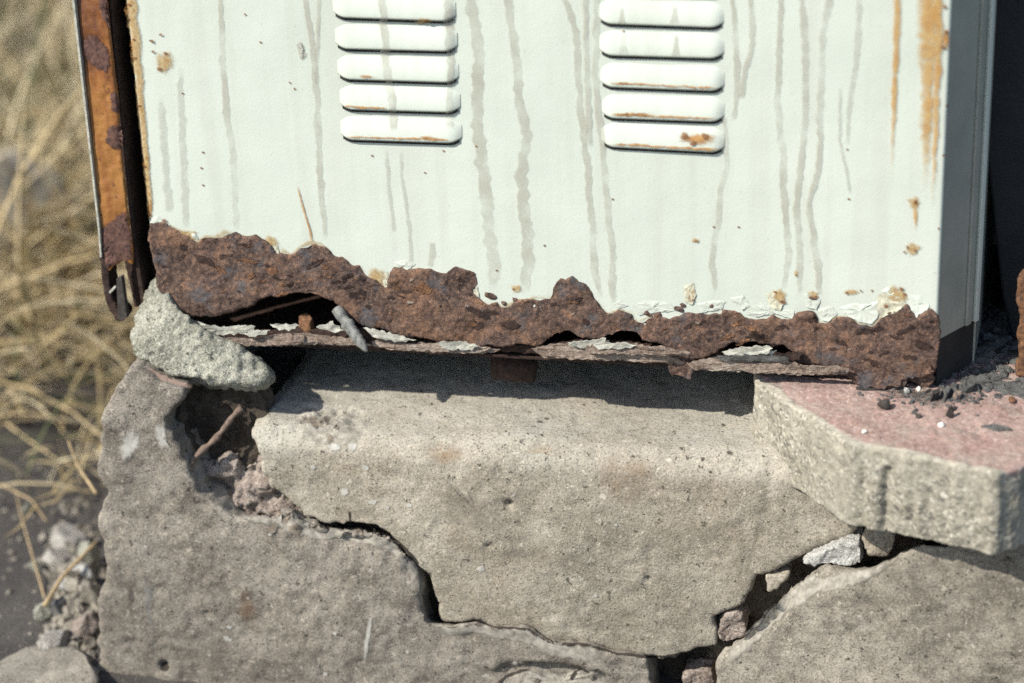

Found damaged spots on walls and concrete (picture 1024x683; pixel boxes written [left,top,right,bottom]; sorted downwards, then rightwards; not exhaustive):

corrosion [98,0,111,28]
corrosion [105,92,123,149]
corrosion [919,0,949,170]
corrosion [125,0,941,389]
damp [781,133,822,224]
corrosion [101,213,132,269]
peeling [611,283,929,324]
crack [186,385,275,471]
crack [320,512,925,679]